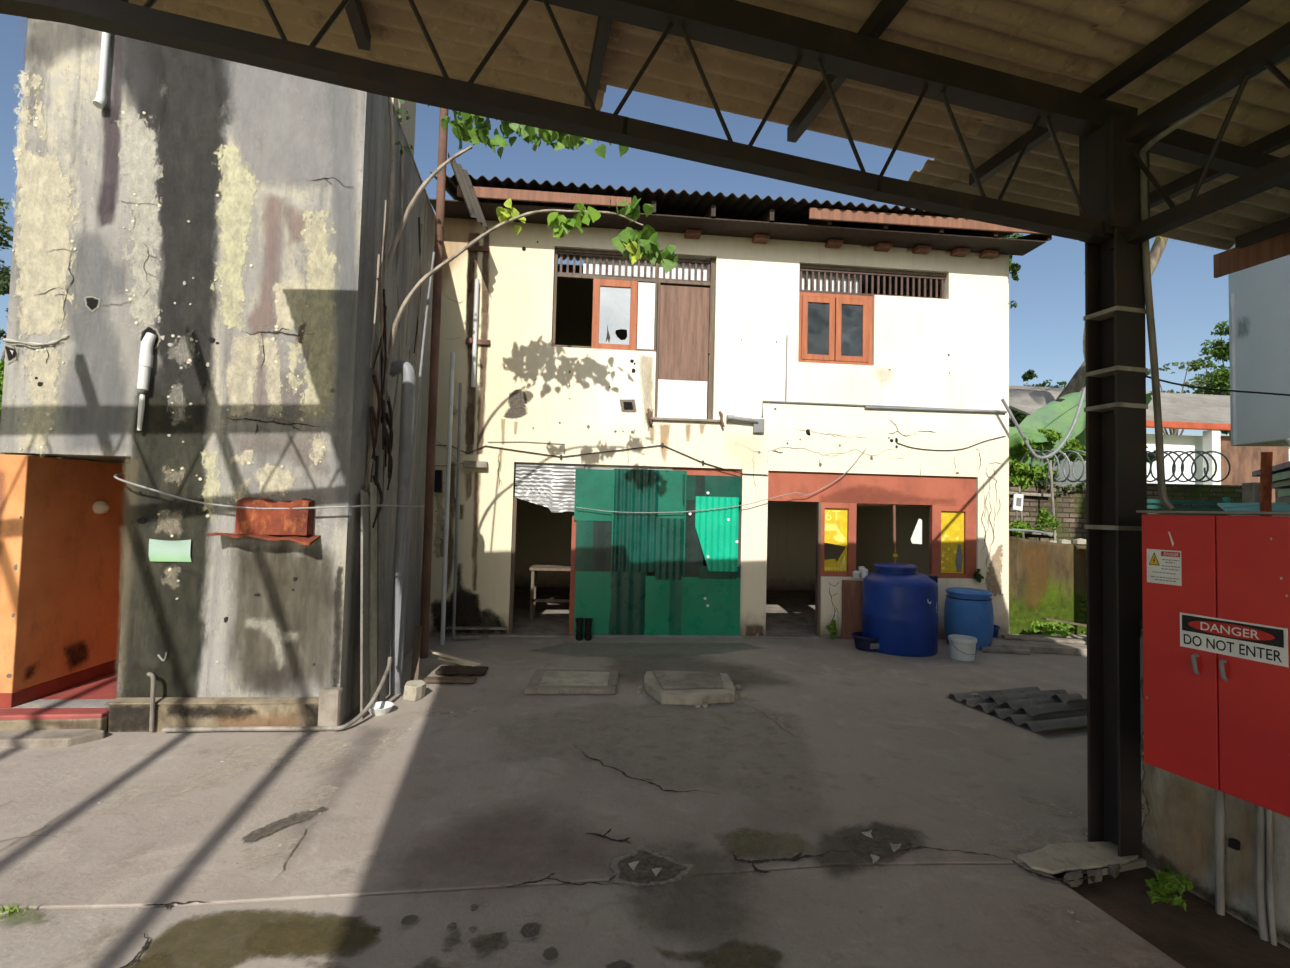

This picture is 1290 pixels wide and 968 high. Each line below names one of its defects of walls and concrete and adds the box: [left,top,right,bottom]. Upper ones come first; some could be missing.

water stain [32,21,97,60]
peeling [3,70,82,454]
peeling [117,105,210,369]
water stain [99,35,353,516]
peeling [211,141,341,468]
rust [250,196,305,340]
water stain [46,238,256,732]
peeling [161,566,180,600]
peeling [162,450,294,521]
water stain [218,470,342,694]
water stain [305,704,319,726]
crack [573,744,720,794]